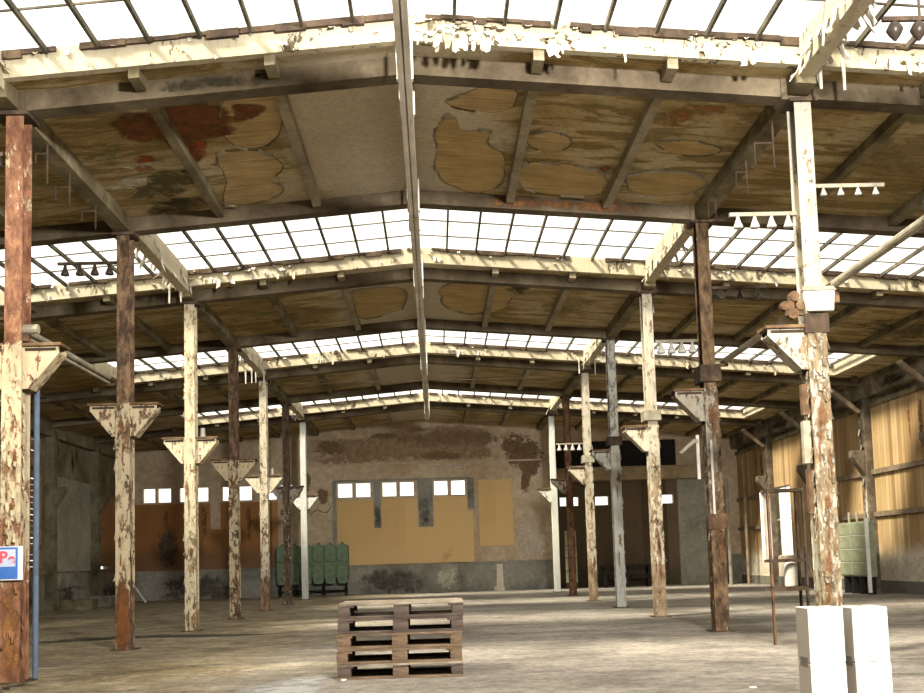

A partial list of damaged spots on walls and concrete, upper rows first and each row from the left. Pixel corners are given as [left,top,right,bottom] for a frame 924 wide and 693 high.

peeling [411,15,506,53]
peeling [540,23,582,58]
rust [112,113,175,153]
rust [163,104,266,162]
flaking render [215,96,285,207]
flaking render [432,88,520,194]
flaking render [518,161,610,198]
flaking render [351,286,408,320]
flaking render [438,283,515,315]
peeling [182,313,197,400]
peeling [804,332,839,546]
rust [115,539,130,649]